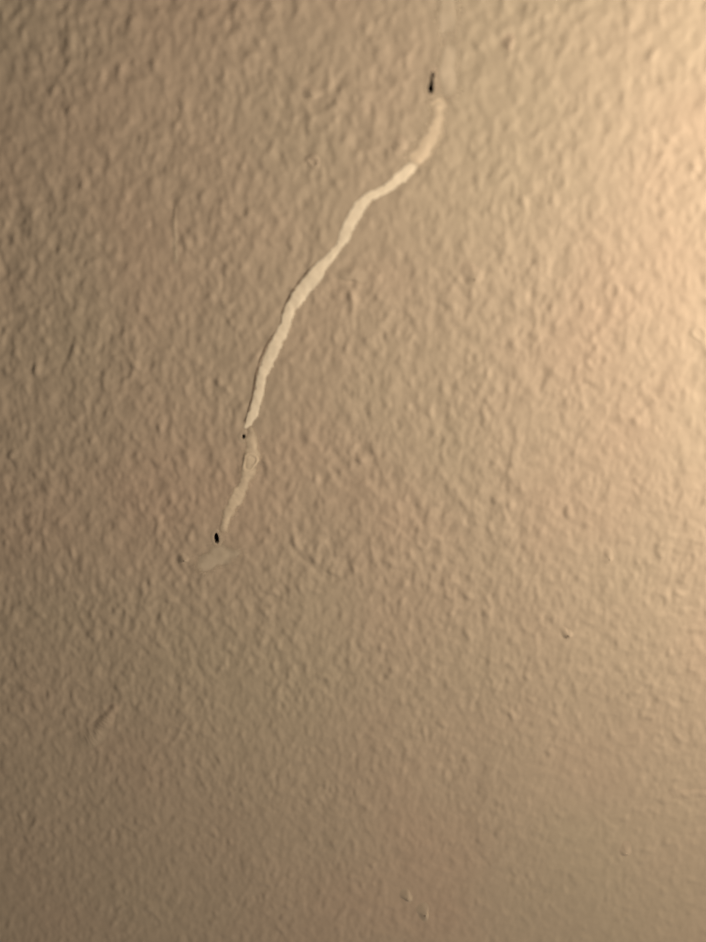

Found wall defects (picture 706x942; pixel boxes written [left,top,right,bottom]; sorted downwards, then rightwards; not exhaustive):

crack [198,0,458,572]